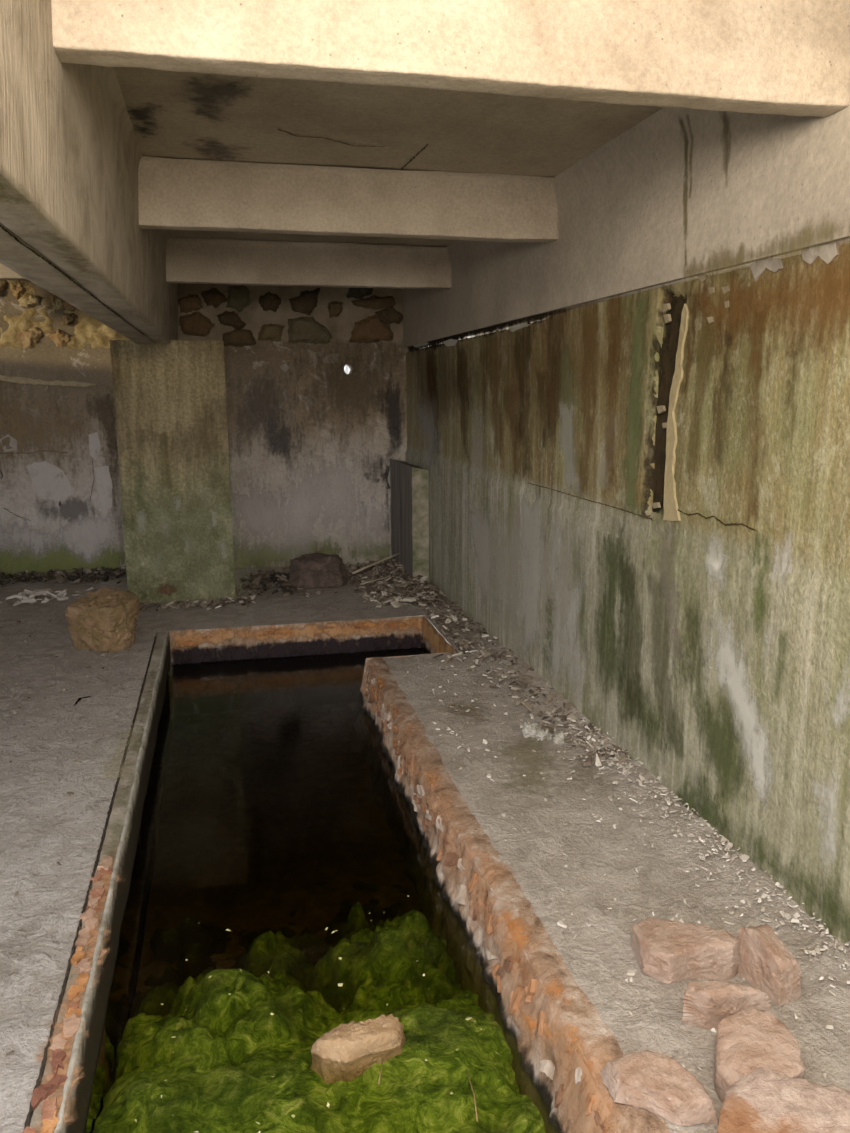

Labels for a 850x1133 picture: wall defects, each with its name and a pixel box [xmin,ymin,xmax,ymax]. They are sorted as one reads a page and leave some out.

water stain [679,120,693,233]
peeling [750,258,784,281]
peeling [801,242,840,264]
water stain [0,380,122,524]
water stain [560,405,579,492]
water stain [598,293,644,512]
spalling [642,289,689,521]
crack [529,483,756,531]
water stain [706,541,724,582]
water stain [751,537,790,627]
efflorescence [709,619,772,798]